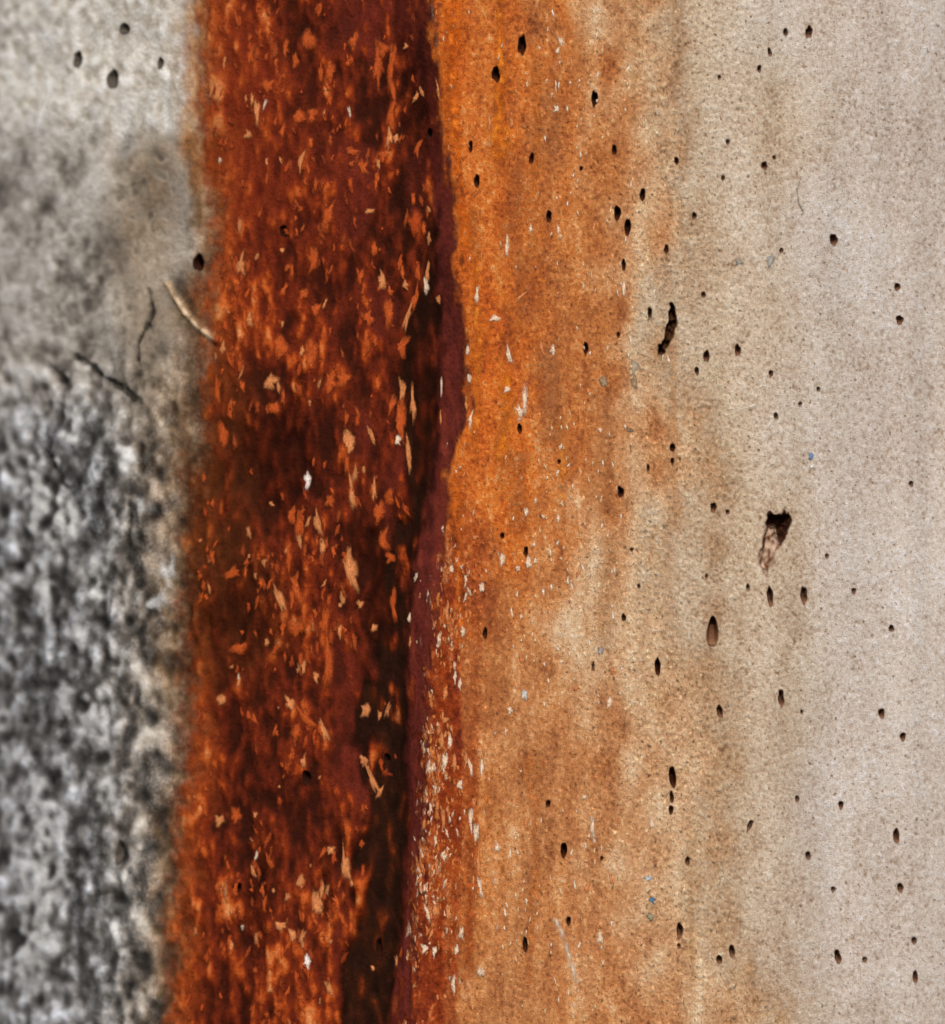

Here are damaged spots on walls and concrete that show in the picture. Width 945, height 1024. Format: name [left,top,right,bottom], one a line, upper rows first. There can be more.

rust [143,0,795,1024]